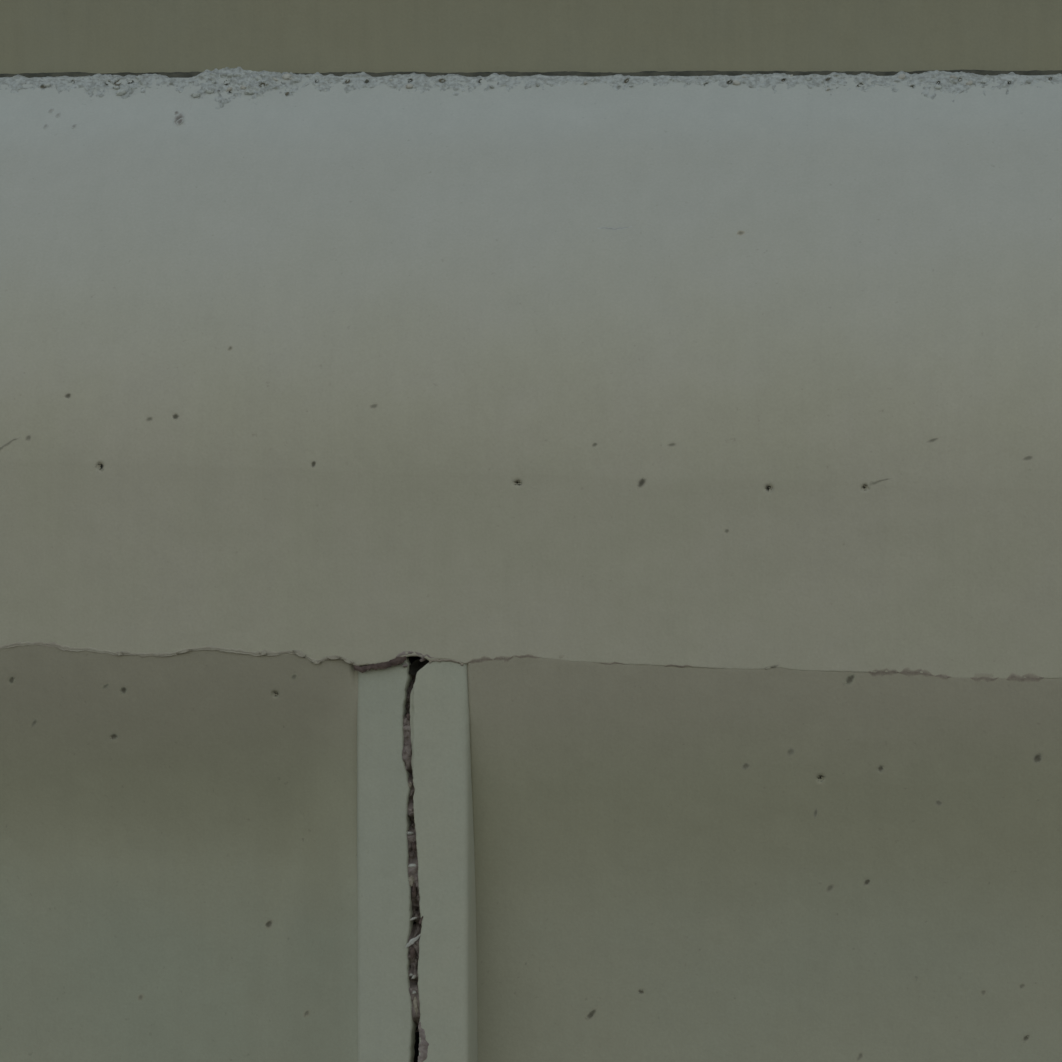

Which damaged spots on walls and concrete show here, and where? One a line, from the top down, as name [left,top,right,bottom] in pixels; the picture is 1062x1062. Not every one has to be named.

spalling [0,67,1062,110]
spalling [354,651,539,675]
peeling [844,667,951,686]
crack [402,656,429,1062]